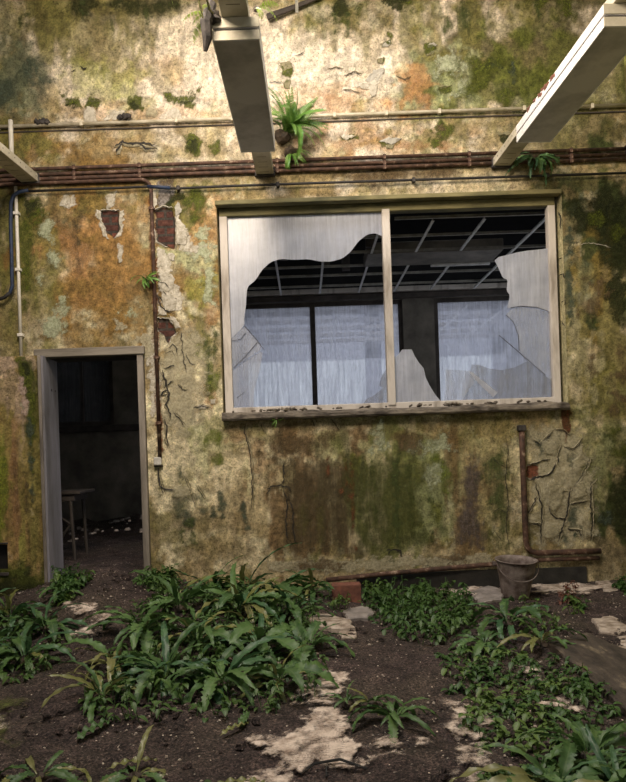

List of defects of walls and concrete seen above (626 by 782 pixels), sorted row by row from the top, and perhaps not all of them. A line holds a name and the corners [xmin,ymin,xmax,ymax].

crack [114,140,157,155]
spalling [95,191,125,263]
crack [157,281,177,314]
flaking render [136,190,216,438]
crack [160,332,211,448]
rust [561,410,572,438]
crack [244,423,296,543]
leakage [256,429,493,575]
crack [492,435,509,543]
crack [528,428,597,545]